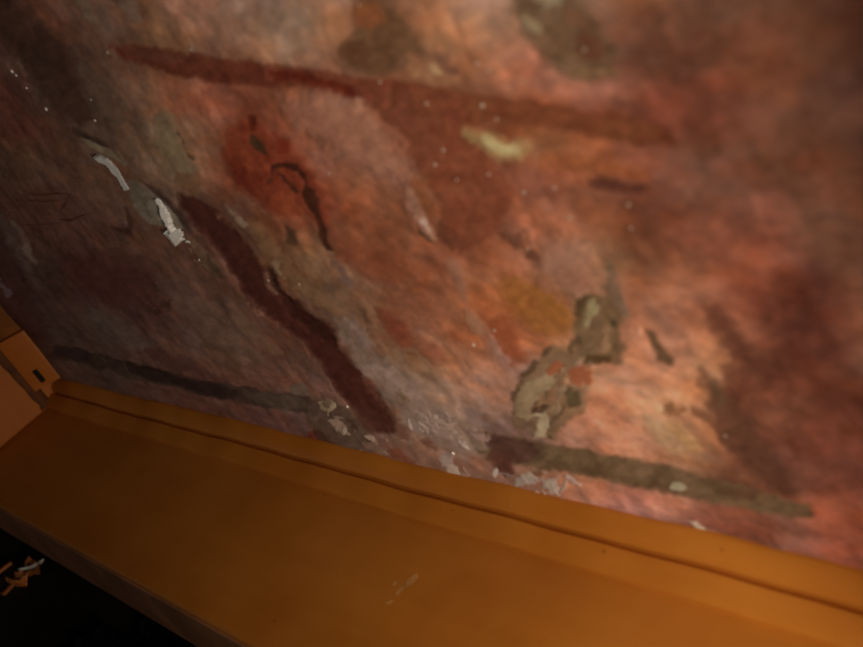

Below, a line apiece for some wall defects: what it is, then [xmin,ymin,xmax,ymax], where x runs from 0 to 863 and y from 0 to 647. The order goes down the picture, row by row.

peeling [71,125,232,279]
spalling [303,395,389,454]
peeling [509,257,631,441]